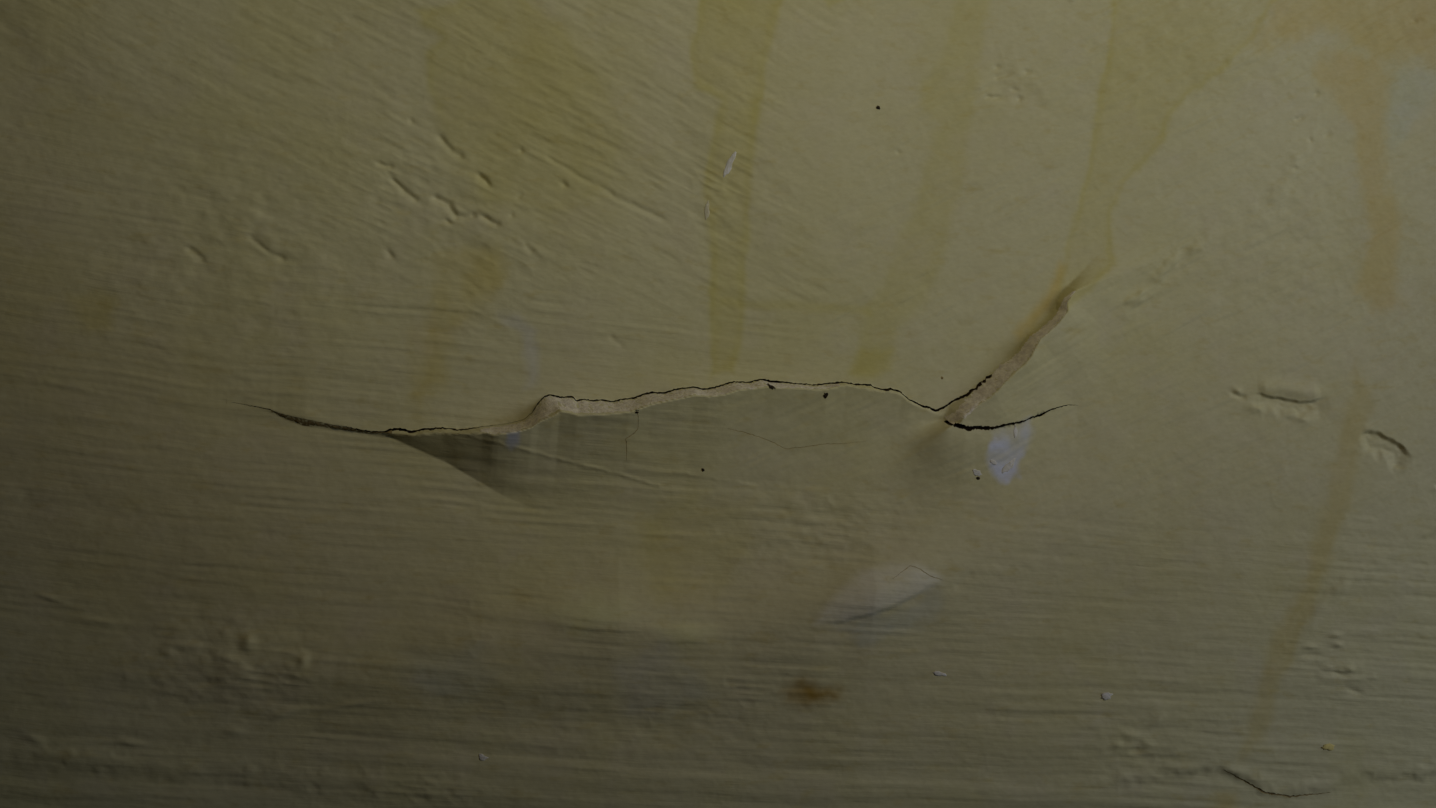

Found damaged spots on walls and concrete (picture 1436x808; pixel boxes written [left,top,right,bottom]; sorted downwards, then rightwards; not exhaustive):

crack [226,291,1083,470]
water stain [687,0,995,389]